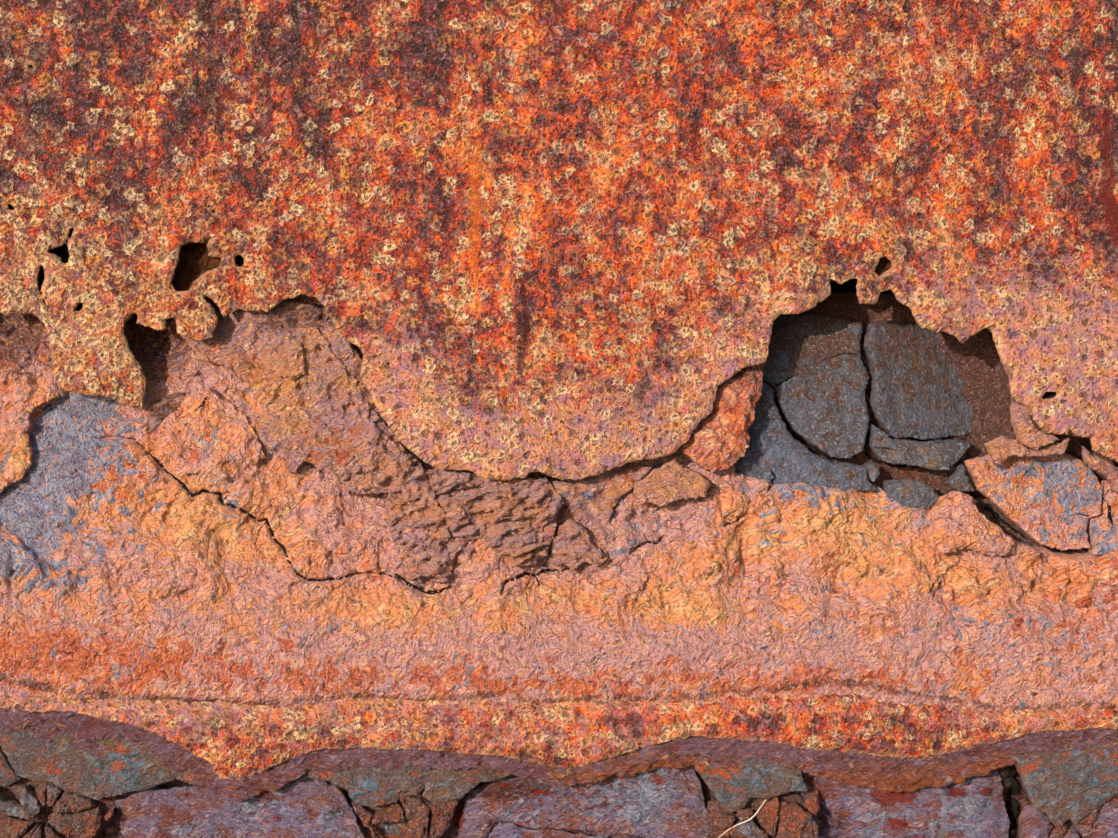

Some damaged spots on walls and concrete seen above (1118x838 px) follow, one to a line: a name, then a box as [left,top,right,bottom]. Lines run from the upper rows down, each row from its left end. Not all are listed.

rust [204,296,223,321]
rust [285,295,326,310]
spalling [0,294,767,584]
crack [763,353,1035,542]
peeling [1009,389,1072,450]
peeling [1081,446,1118,491]
crack [106,436,450,595]
rust [0,312,1118,712]
peeling [926,491,1016,557]
crack [1070,489,1115,530]
crack [502,568,569,591]
crack [1005,766,1020,830]